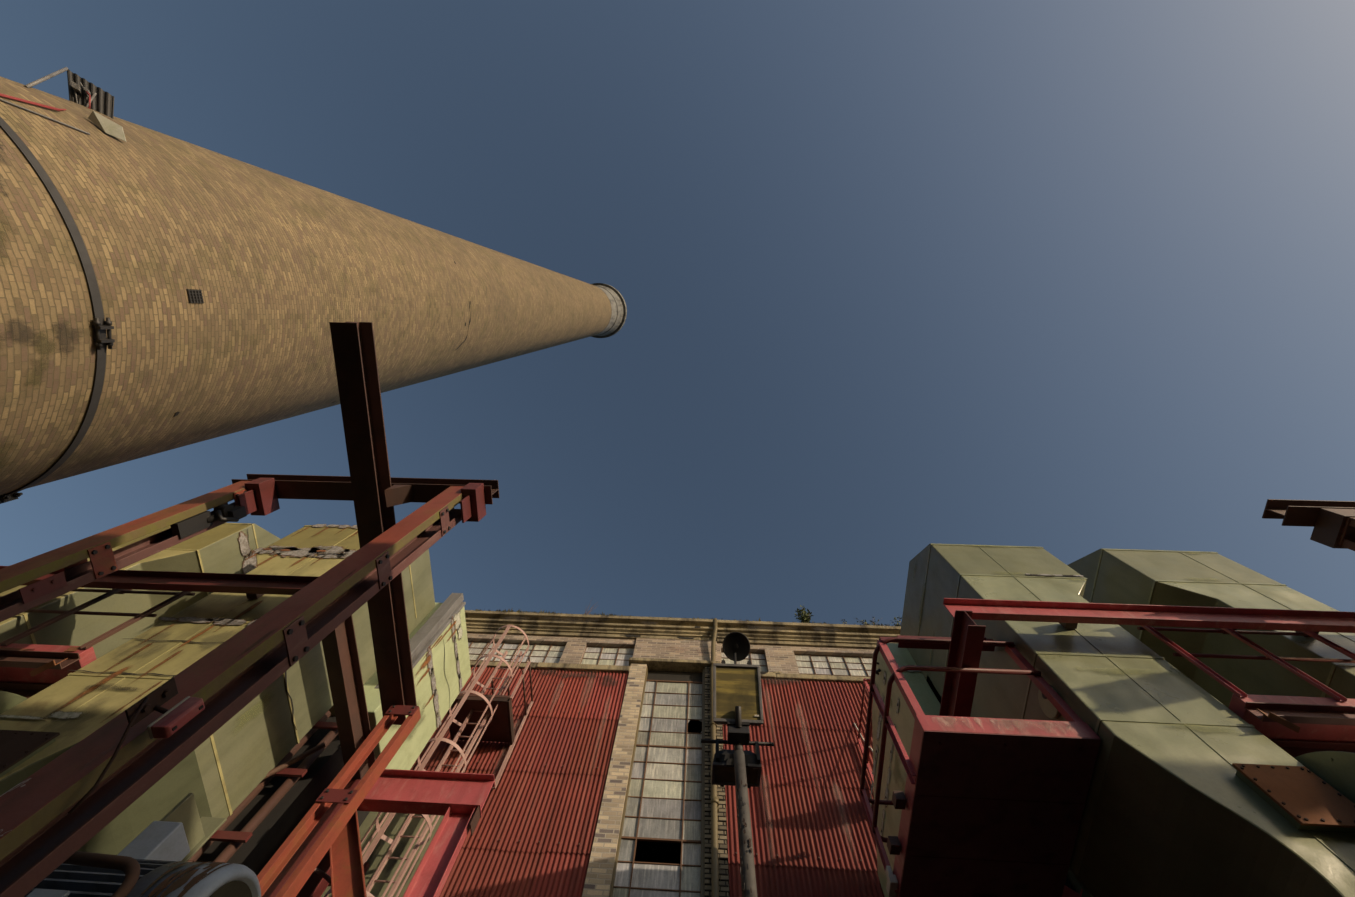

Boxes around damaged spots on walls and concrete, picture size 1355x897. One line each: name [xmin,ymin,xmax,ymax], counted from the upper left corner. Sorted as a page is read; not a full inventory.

peeling [238,524,358,574]
corrosion [52,643,182,719]